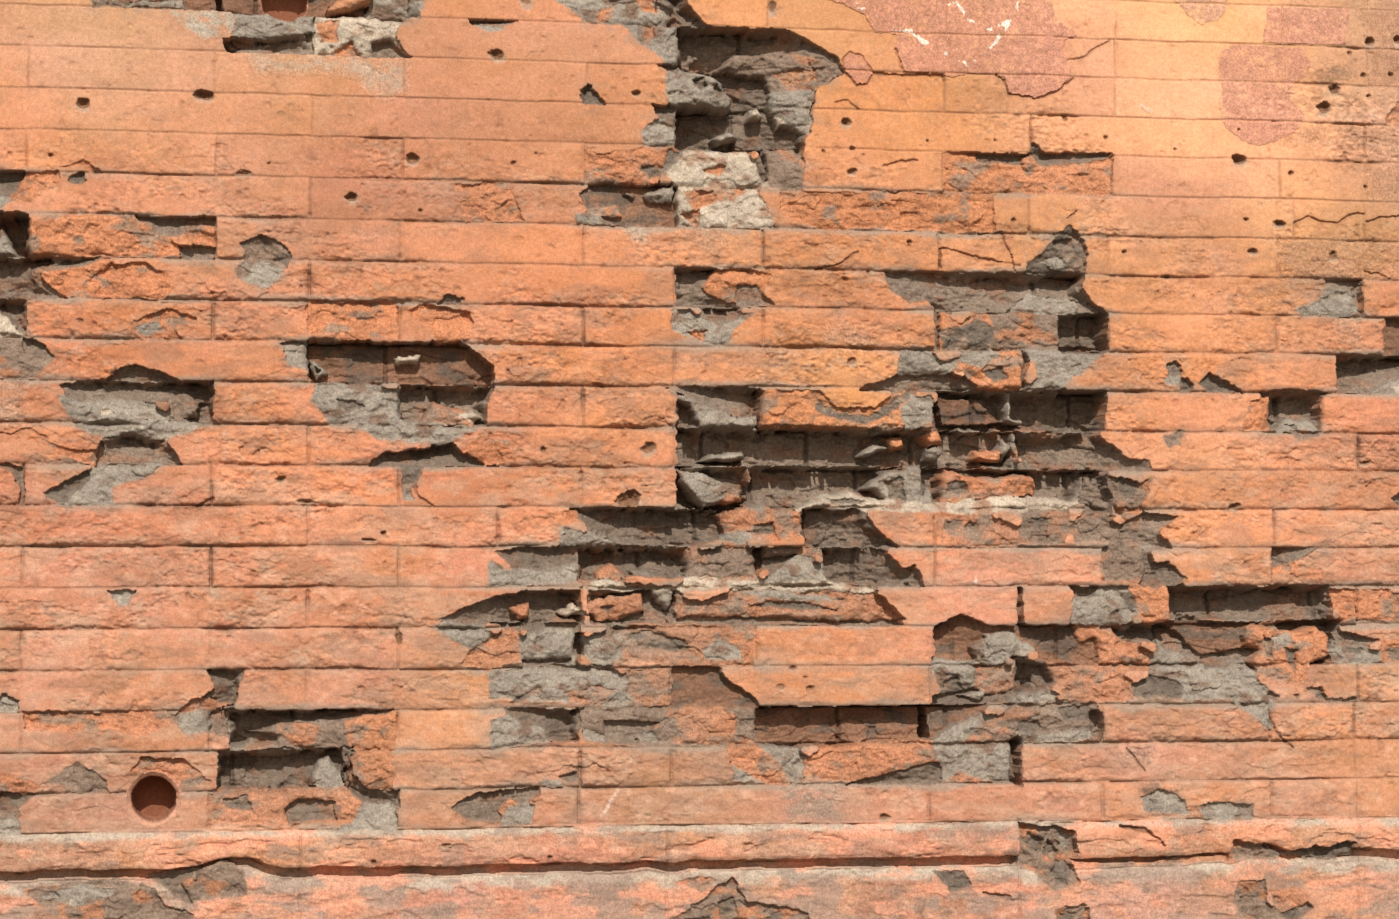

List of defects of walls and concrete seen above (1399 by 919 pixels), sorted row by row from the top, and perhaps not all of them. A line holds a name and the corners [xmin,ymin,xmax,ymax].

spalling [90,0,424,60]
spalling [555,0,1115,244]
crack [995,40,1111,100]
spalling [0,154,217,381]
crack [1293,213,1399,224]
spalling [0,463,26,506]
spalling [40,365,215,508]
spalling [280,295,517,502]
spalling [429,226,1399,788]
spalling [0,669,401,836]
spalling [671,876,810,919]
spalling [1015,823,1091,919]